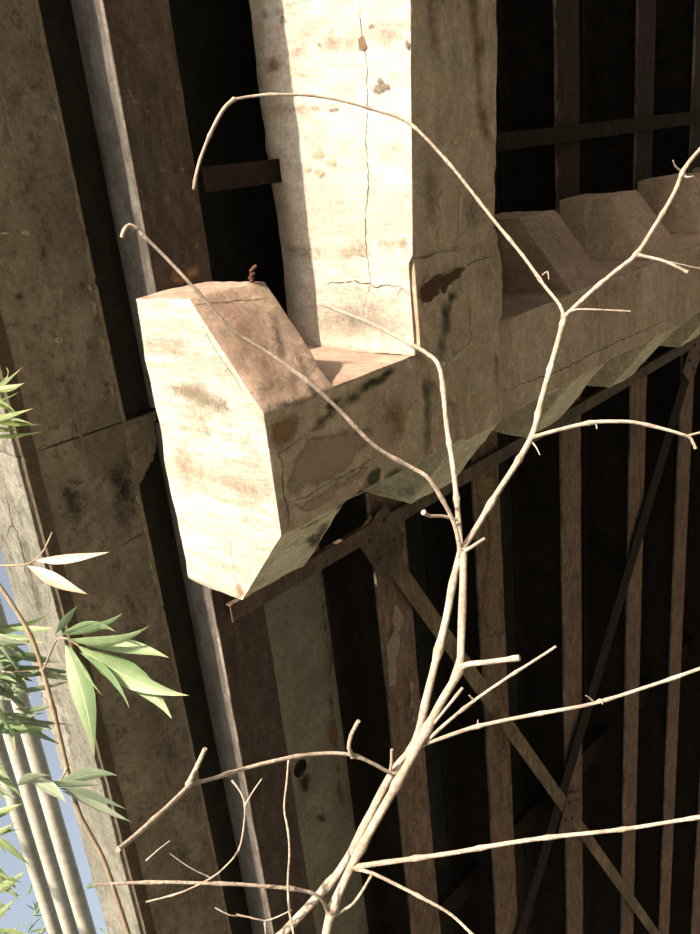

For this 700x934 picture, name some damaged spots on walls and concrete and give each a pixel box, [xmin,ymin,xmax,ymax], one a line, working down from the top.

crack [322,2,413,313]
rust [272,418,298,445]
crack [278,437,376,526]
peeling [386,604,404,695]